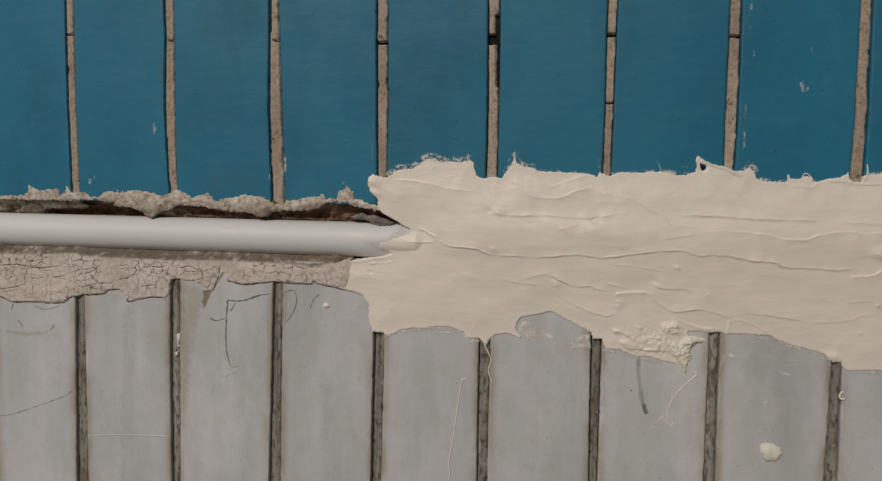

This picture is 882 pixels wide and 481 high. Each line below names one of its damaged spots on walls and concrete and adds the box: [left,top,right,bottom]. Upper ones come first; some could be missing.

spalling [0,185,397,226]
crack [0,252,220,300]
peeling [0,243,354,303]